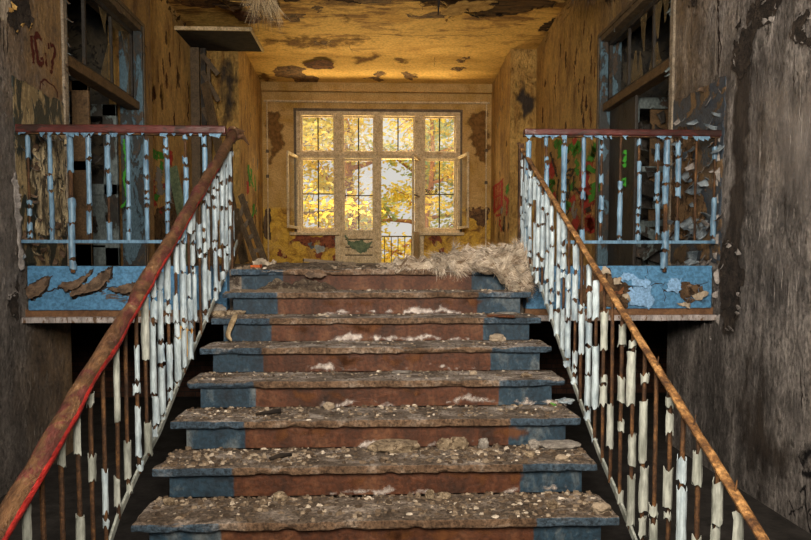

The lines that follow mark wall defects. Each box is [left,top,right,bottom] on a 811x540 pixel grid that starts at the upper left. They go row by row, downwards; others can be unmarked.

peeling [282,0,391,22]
peeling [272,60,334,83]
peeling [363,71,386,82]
peeling [560,20,596,129]